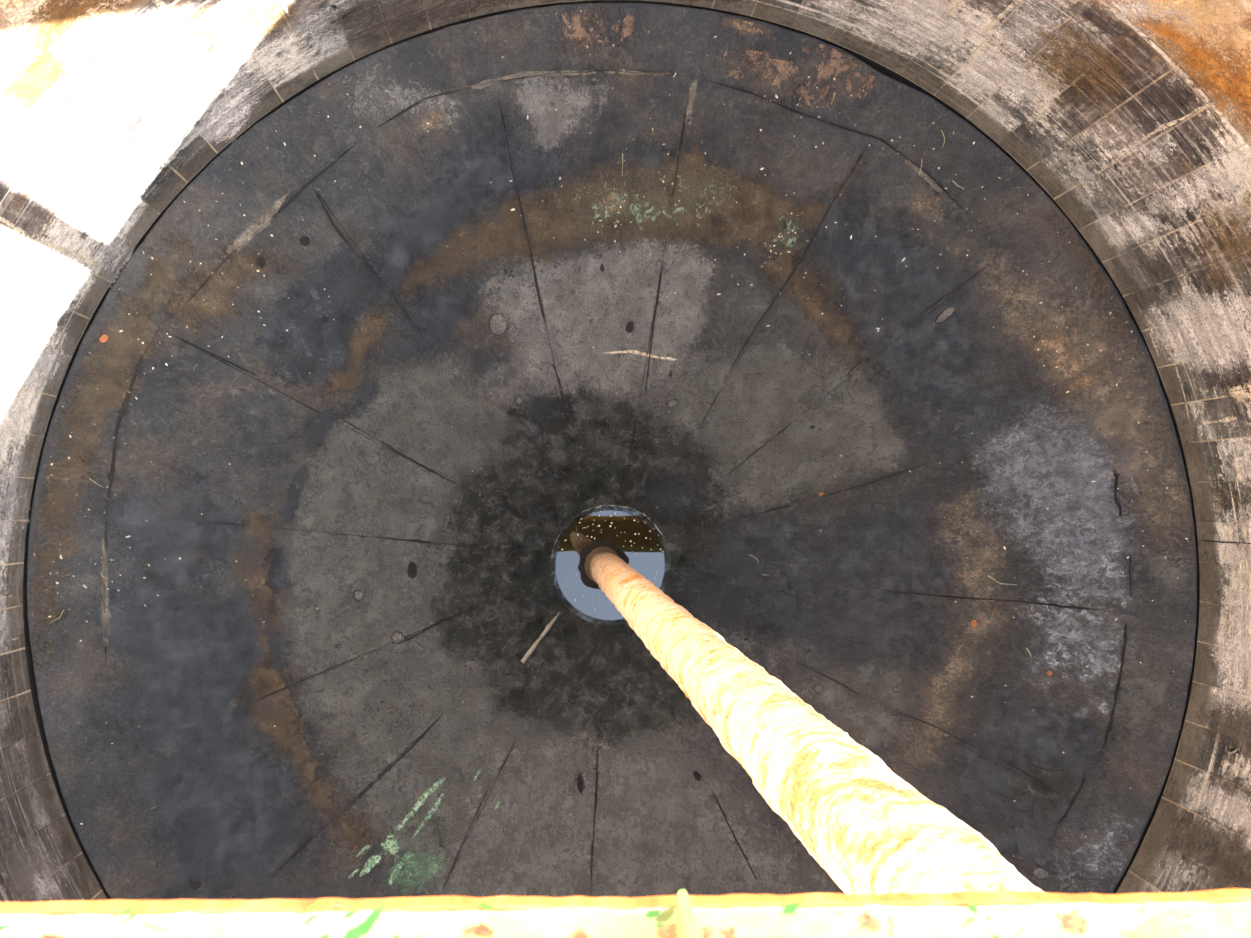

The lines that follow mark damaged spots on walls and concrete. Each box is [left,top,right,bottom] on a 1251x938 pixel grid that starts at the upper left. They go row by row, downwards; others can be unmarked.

rust [1,0,121,110]
leakage [200,60,260,146]
rust [1032,15,1251,131]
leakage [1138,79,1193,167]
leakage [1094,162,1251,419]
leakage [0,117,1189,902]
crack [1113,468,1139,519]
crack [797,555,1132,826]
leakage [1157,466,1251,891]
leakage [320,903,386,938]
leakage [645,908,674,922]
leakage [783,901,803,914]